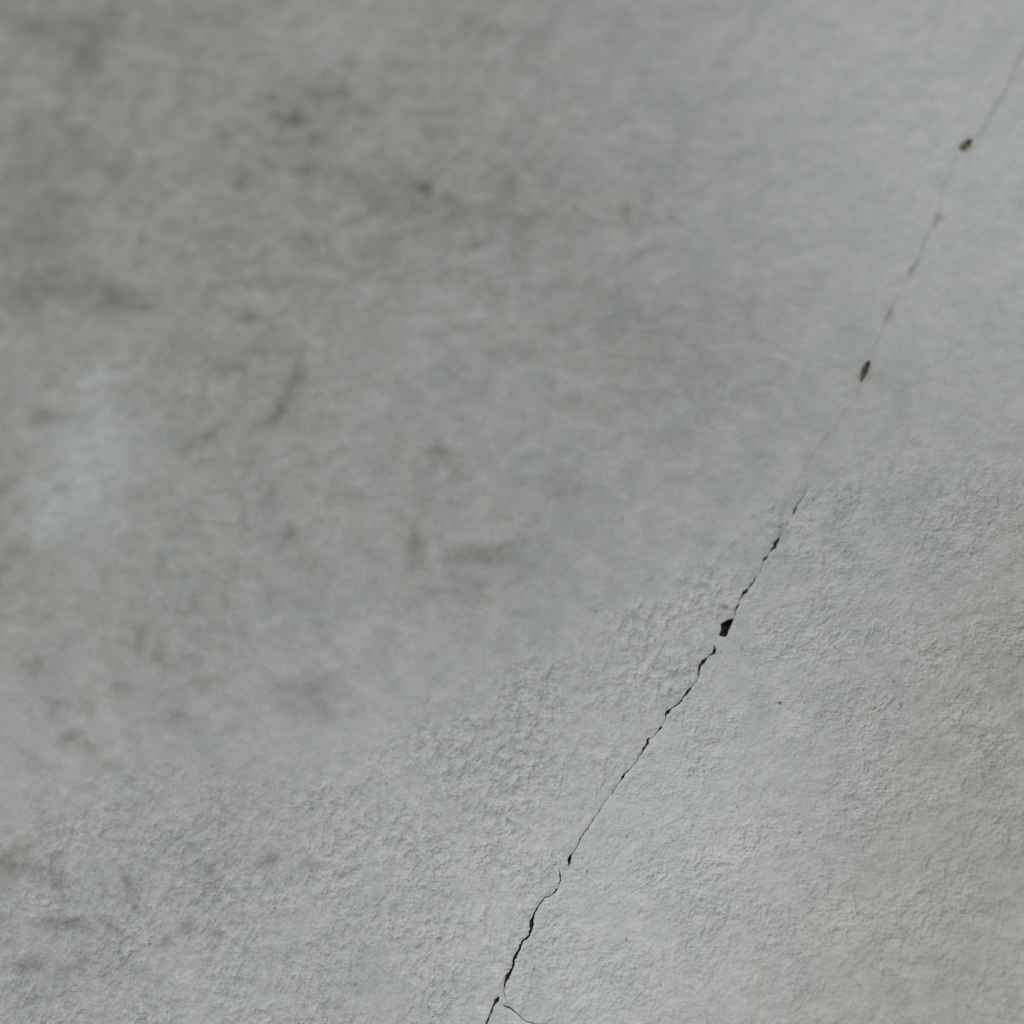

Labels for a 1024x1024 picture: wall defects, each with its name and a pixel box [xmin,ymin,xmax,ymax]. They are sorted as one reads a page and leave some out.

crack [866,41,1024,359]
crack [716,386,864,616]
crack [486,645,716,1024]